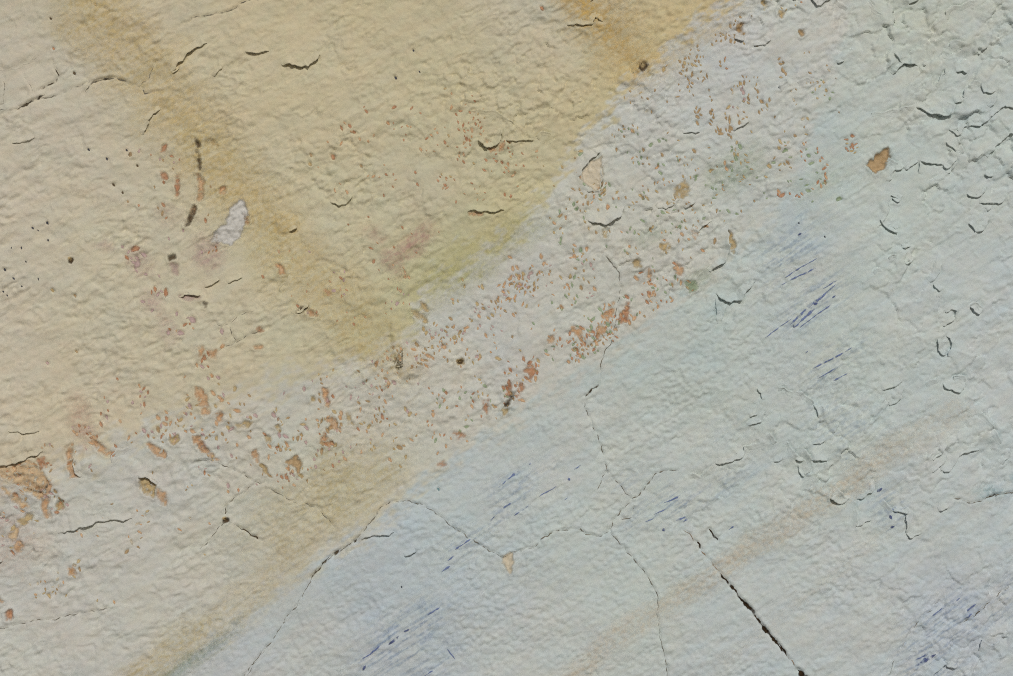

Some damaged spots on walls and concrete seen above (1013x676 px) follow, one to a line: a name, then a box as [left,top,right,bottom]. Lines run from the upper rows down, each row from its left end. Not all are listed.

peeling [711,16,771,46]
peeling [126,144,180,195]
peeling [121,245,242,312]
peeling [182,138,225,232]
peeling [201,200,248,254]
peeling [250,44,844,489]
peeling [67,329,257,478]
peeling [0,443,69,562]
peeling [137,471,167,505]
crack [198,256,675,674]
peeling [29,559,81,598]
crack [685,529,807,676]